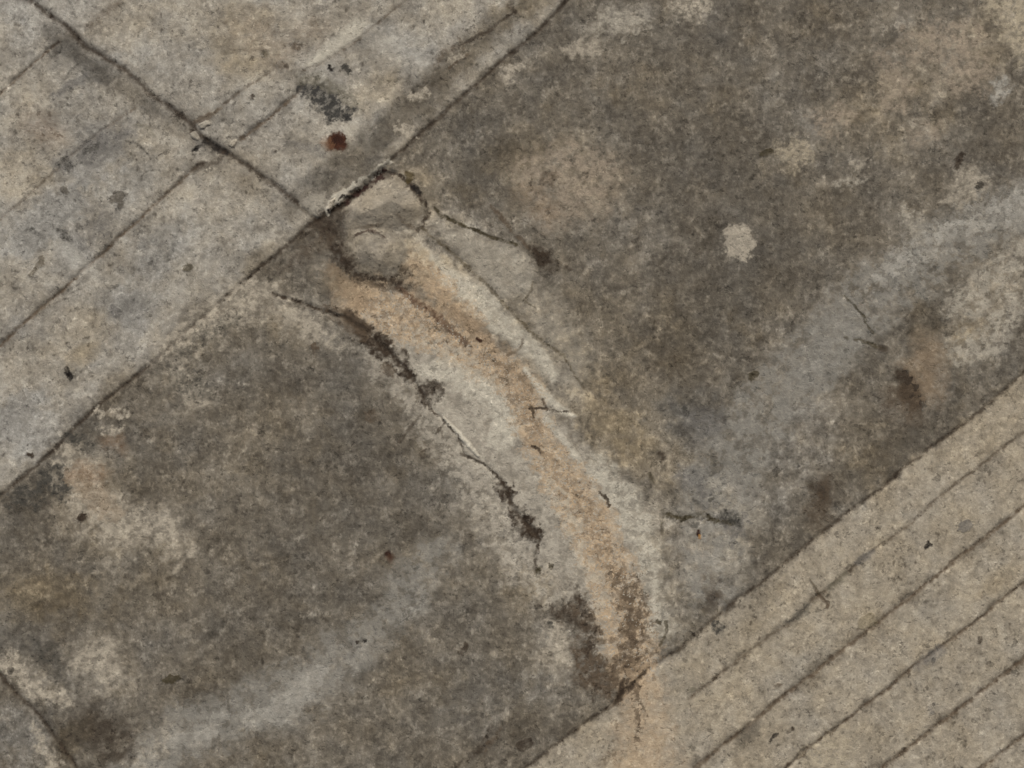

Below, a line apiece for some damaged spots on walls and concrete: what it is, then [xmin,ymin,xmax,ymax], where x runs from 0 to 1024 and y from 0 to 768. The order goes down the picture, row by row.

rust [317,128,350,154]
crack [325,168,586,419]
crack [271,291,545,570]